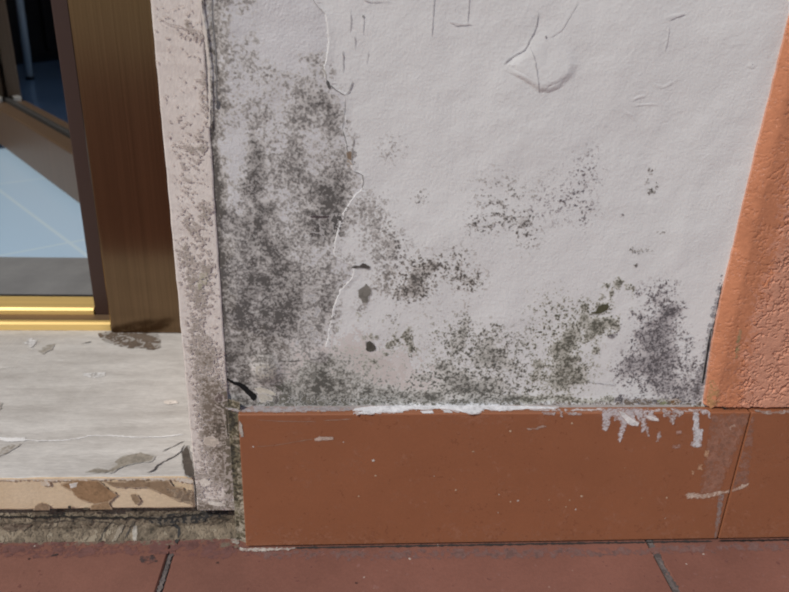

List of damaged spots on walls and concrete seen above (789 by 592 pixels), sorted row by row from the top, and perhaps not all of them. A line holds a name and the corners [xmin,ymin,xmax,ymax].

crack [505,4,577,90]
flaking render [198,0,372,347]
mould [644,167,659,196]